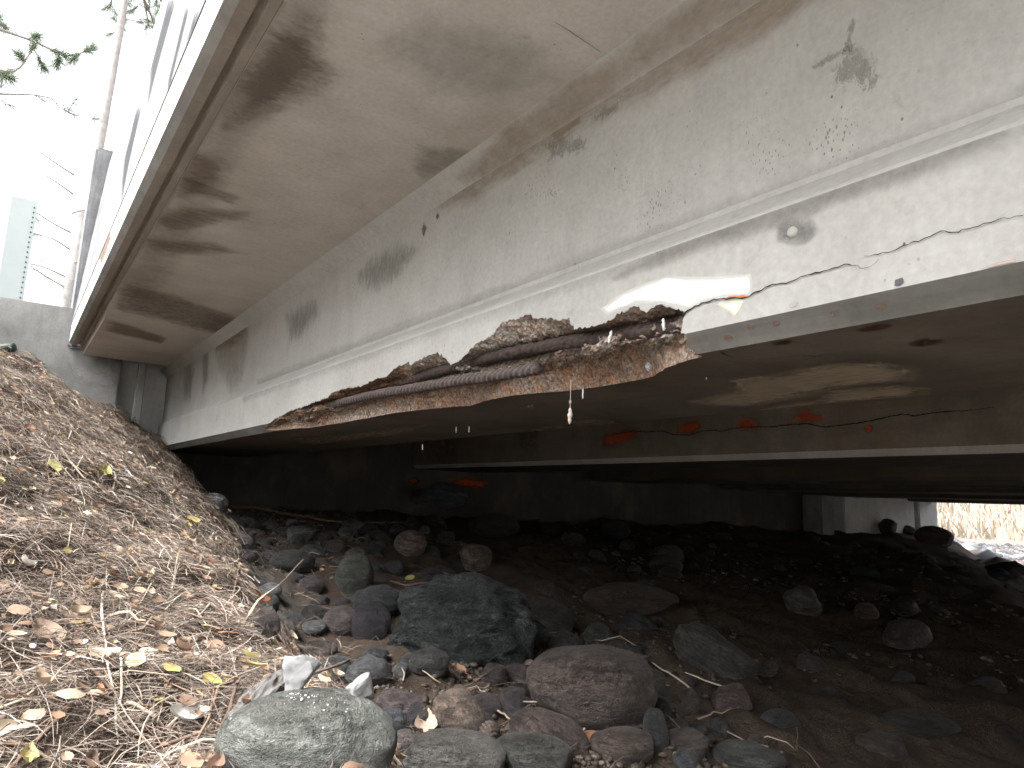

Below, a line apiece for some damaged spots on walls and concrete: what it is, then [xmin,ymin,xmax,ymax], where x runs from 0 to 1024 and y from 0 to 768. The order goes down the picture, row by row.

water stain [121,109,139,199]
crack [682,215,1023,316]
water stain [122,290,231,332]
spalling [264,304,703,430]
crack [611,407,994,436]
water stain [703,365,915,407]